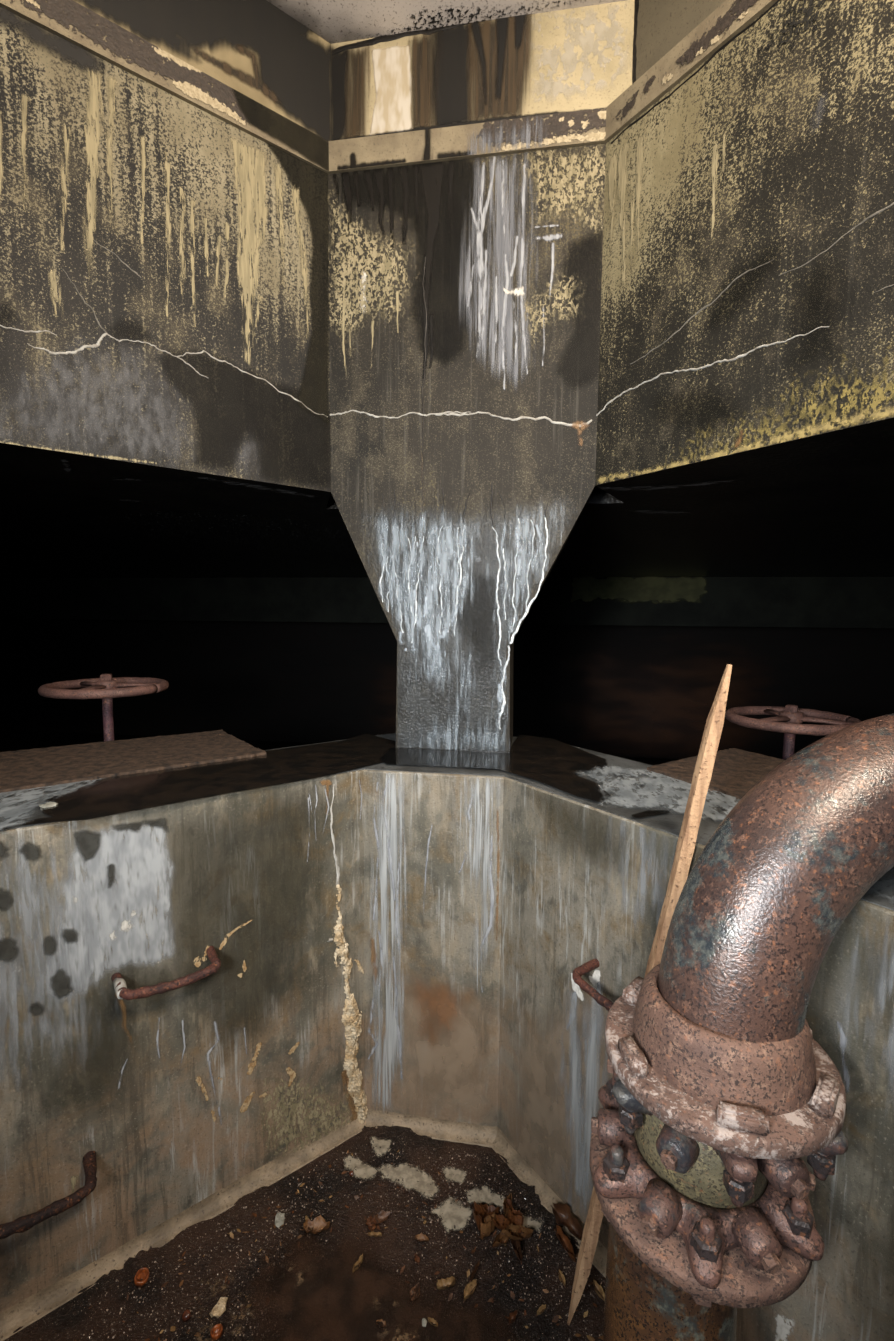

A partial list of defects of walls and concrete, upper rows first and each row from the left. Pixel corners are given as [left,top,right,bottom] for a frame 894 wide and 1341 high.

leakage [49,270,61,316]
leakage [0,6,116,254]
leakage [78,0,646,497]
crack [0,202,894,427]
leakage [711,133,725,238]
leakage [599,408,894,490]
leakage [379,481,691,853]
leakage [0,734,484,1110]
crack [327,784,368,1124]
leakage [461,779,499,992]
leakage [701,789,740,820]
leakage [512,970,613,1241]